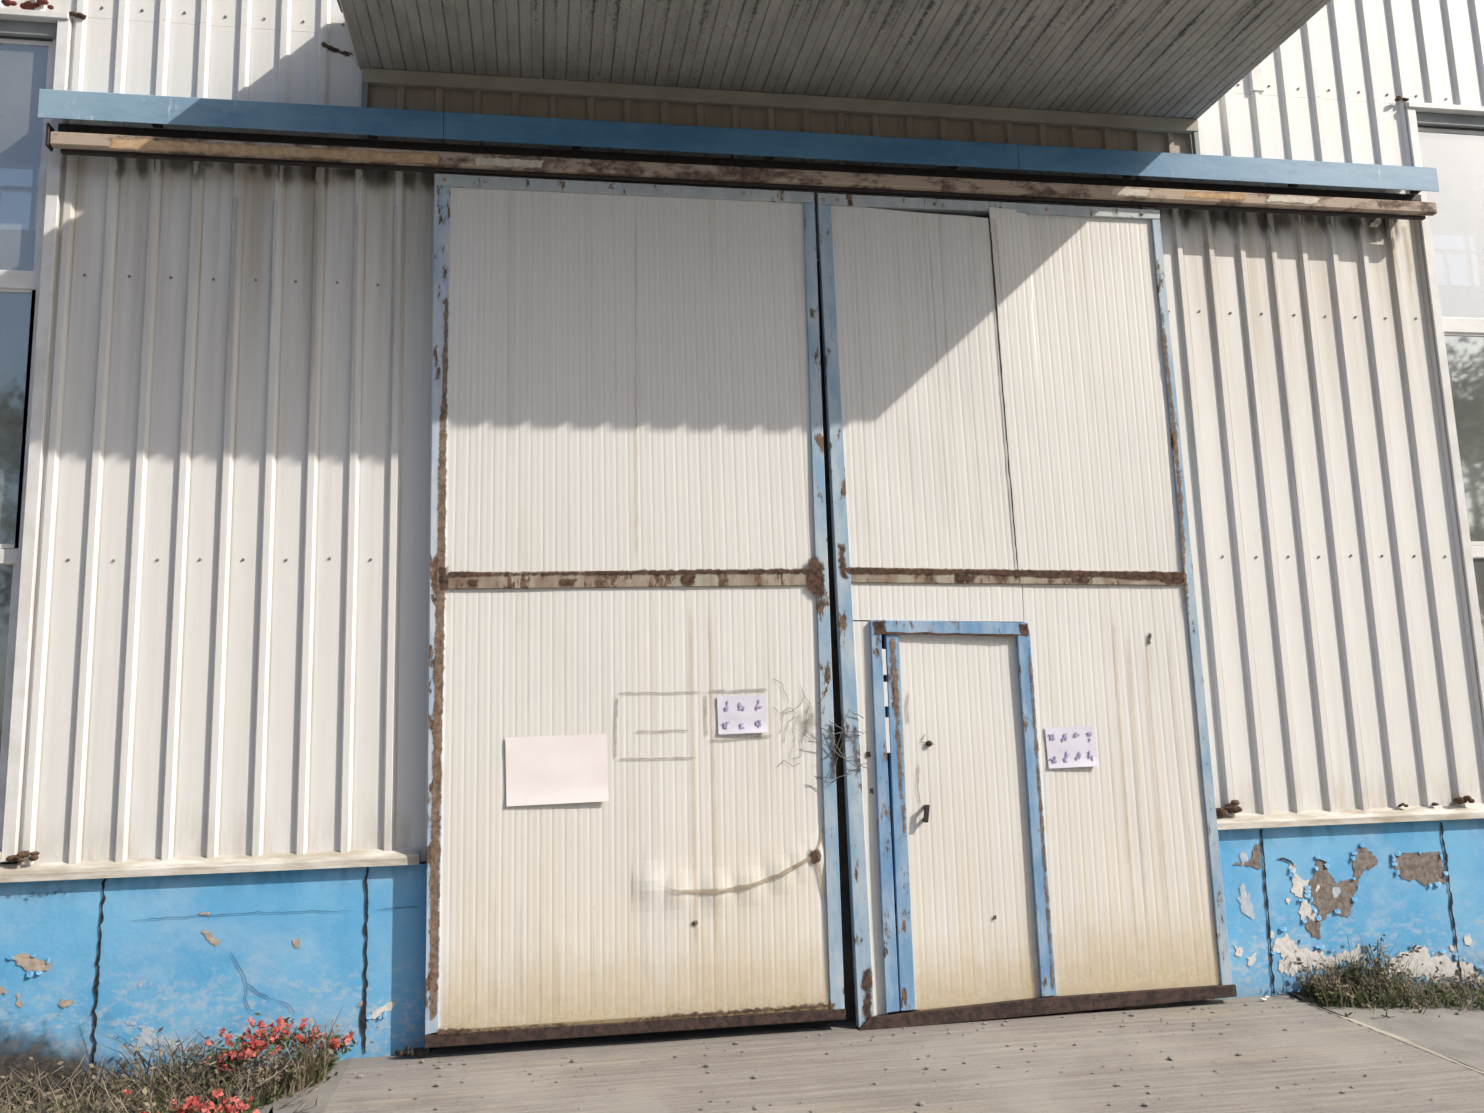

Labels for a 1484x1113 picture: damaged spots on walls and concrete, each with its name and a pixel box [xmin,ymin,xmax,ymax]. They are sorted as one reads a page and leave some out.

rust [110,138,440,164]
rust [473,157,544,168]
damp [1168,208,1396,233]
rust [429,301,1189,1036]
peeling [0,986,23,1007]
peeling [7,953,52,978]
crack [91,867,419,1093]
crack [1260,829,1295,994]
spalling [1233,842,1484,985]
crack [1440,822,1462,983]